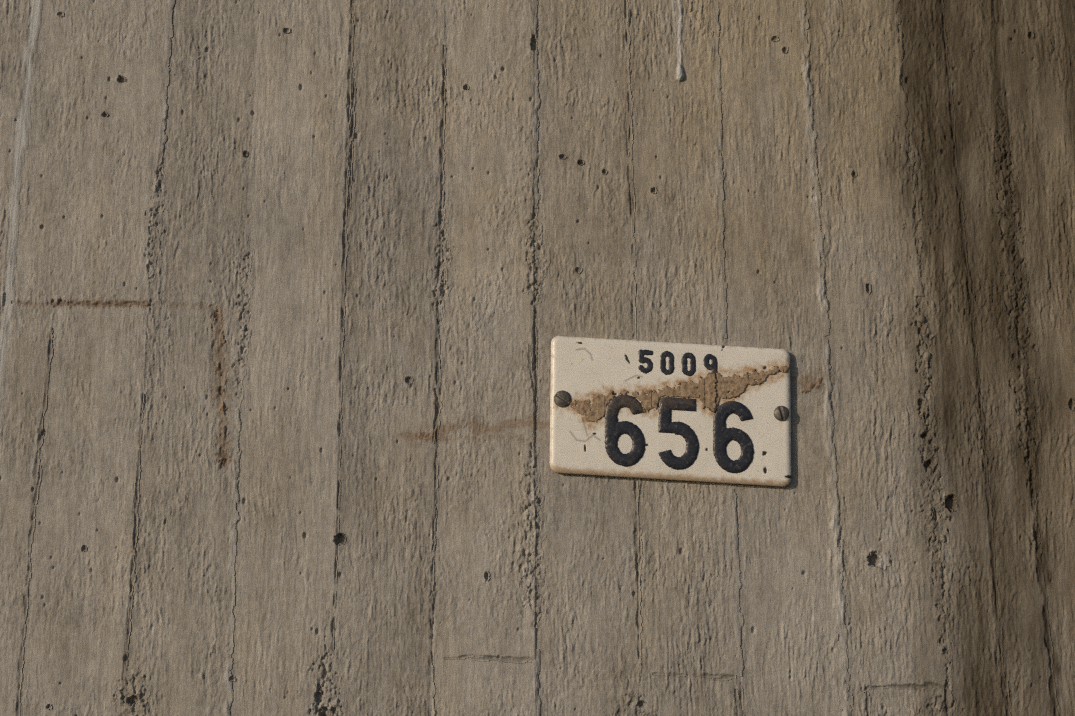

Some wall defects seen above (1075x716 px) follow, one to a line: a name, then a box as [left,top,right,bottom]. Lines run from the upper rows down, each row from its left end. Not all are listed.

water stain [855,0,1075,716]